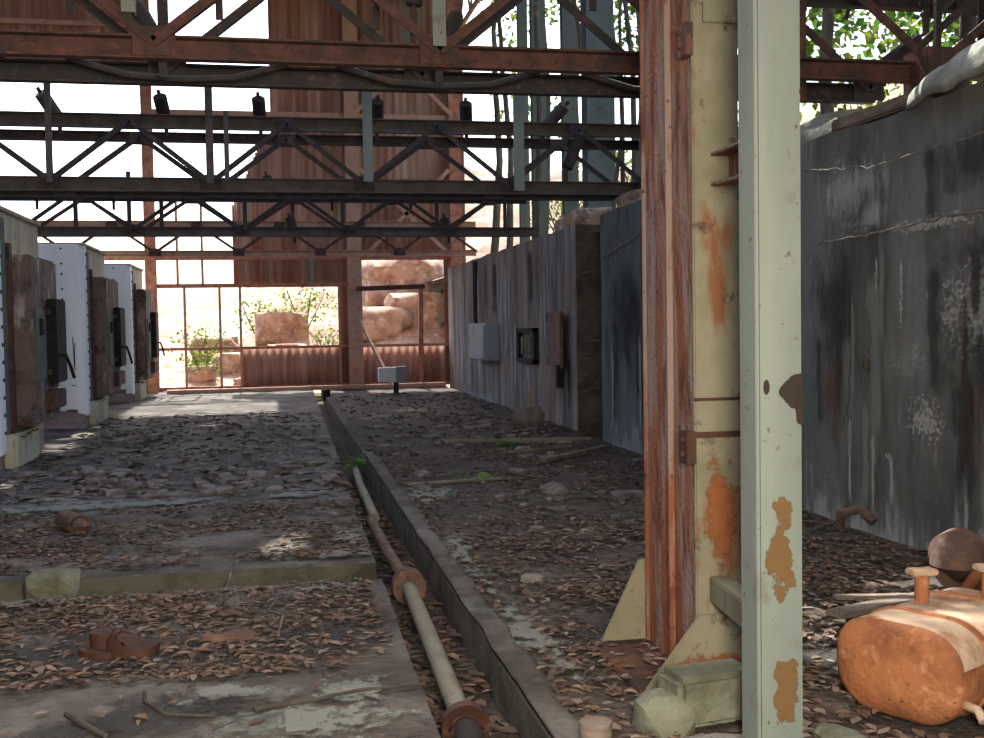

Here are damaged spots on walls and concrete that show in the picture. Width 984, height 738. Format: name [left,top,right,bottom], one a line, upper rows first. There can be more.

damp [927,270,940,385]
damp [971,239,984,314]
peeling [763,373,803,425]
damp [808,251,929,551]
damp [952,332,984,529]
rust [704,459,739,558]
peeling [766,497,796,603]
peeling [773,659,800,723]